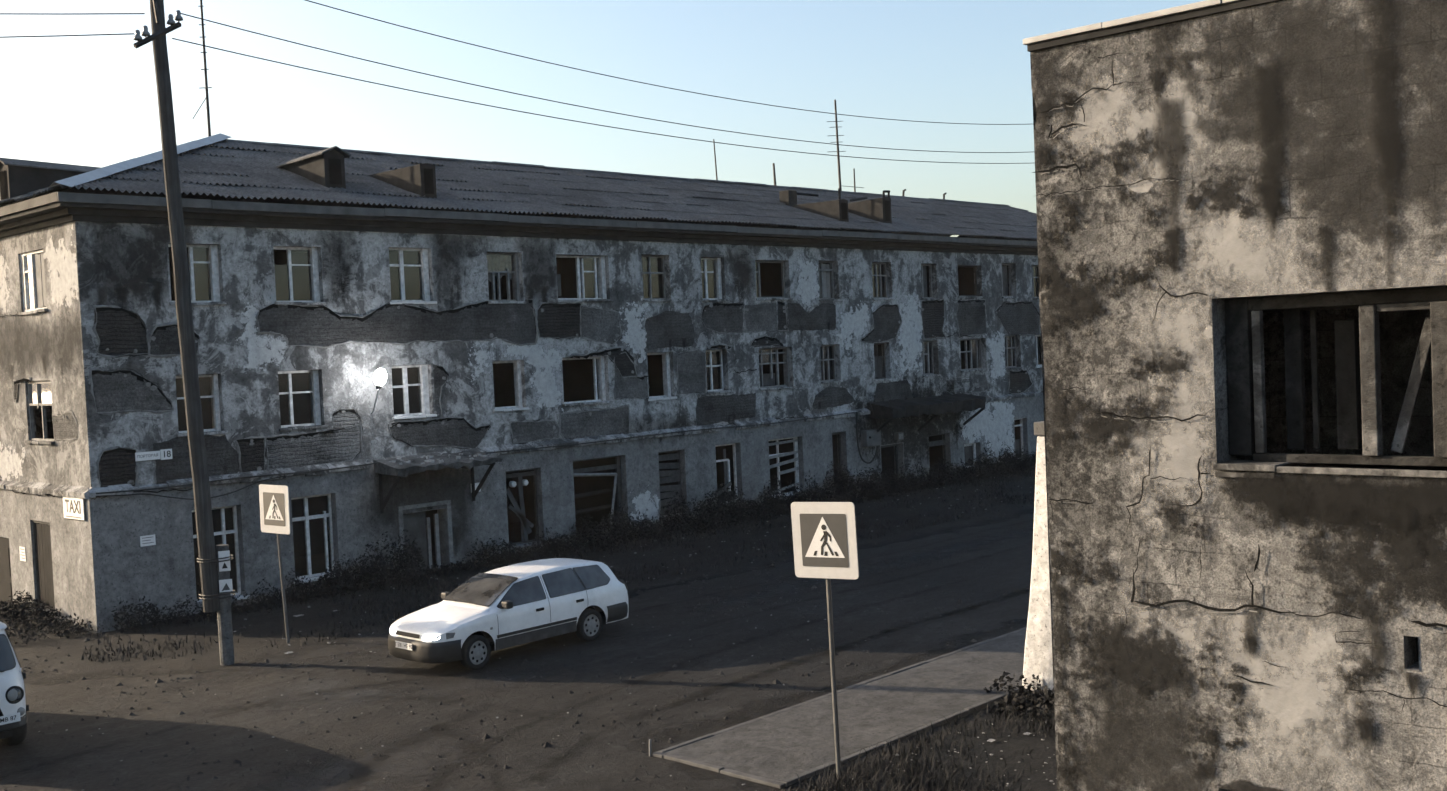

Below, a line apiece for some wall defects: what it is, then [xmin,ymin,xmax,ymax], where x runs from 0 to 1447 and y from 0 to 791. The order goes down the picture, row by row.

damp [1034,0,1447,340]
spalling [41,223,200,415]
spalling [153,253,1040,488]
spalling [96,446,139,490]
crack [1233,661,1282,688]
damp [1210,471,1447,741]
crack [1348,689,1447,713]